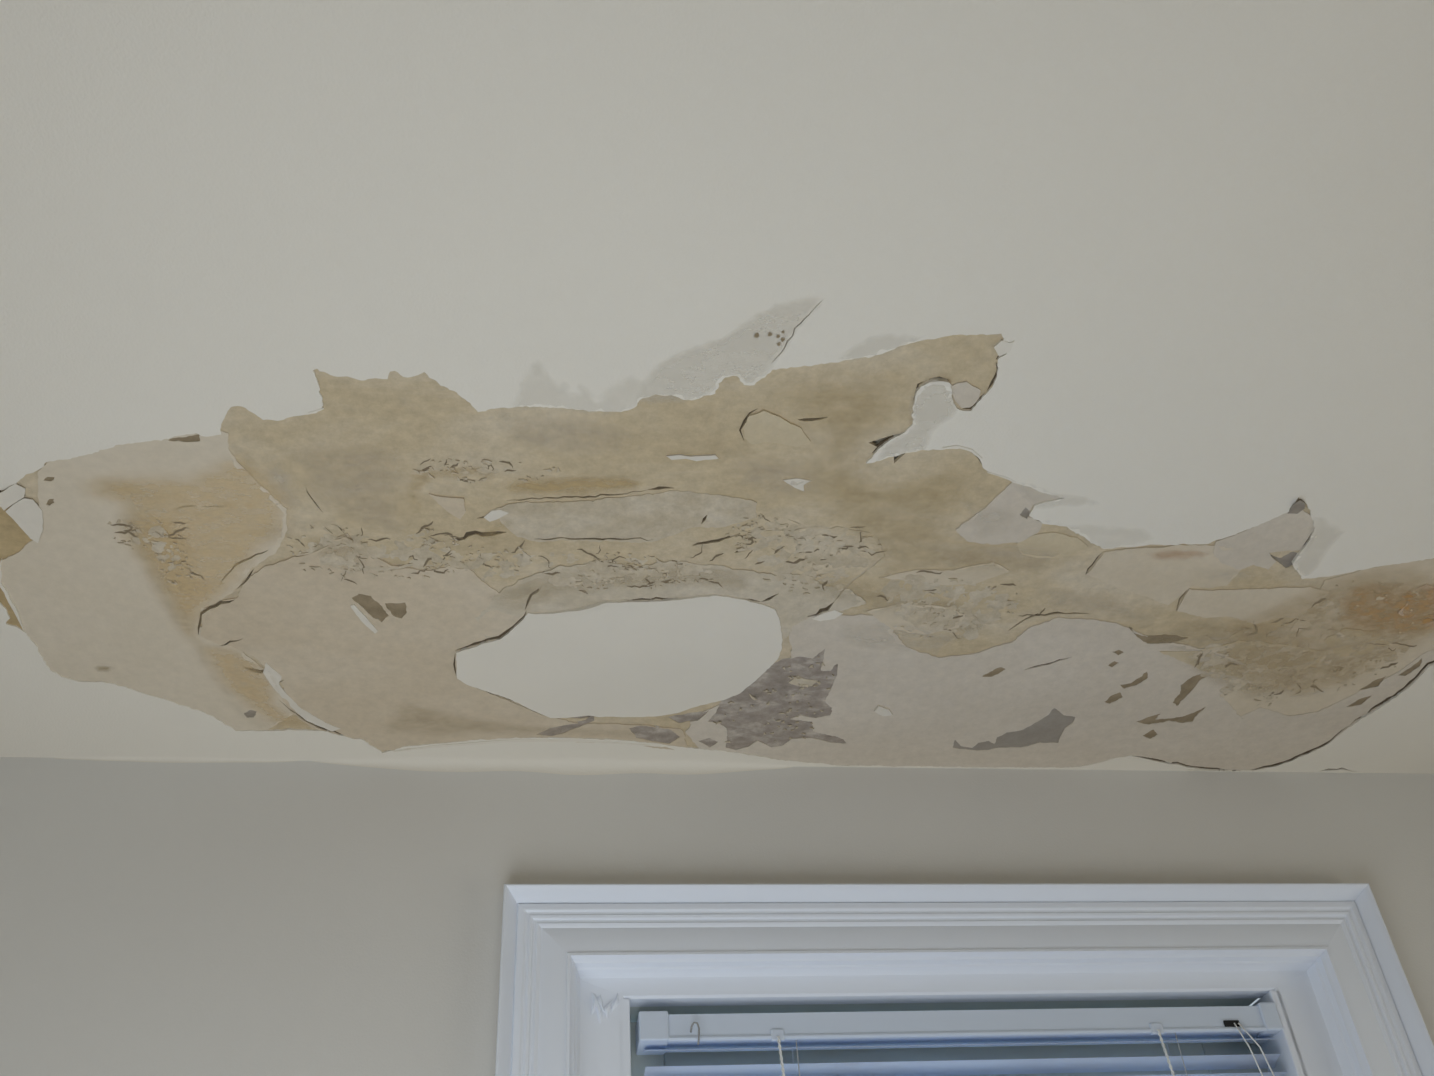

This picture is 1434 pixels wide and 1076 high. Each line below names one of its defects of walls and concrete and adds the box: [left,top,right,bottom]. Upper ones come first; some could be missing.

peeling [0,334,1434,771]